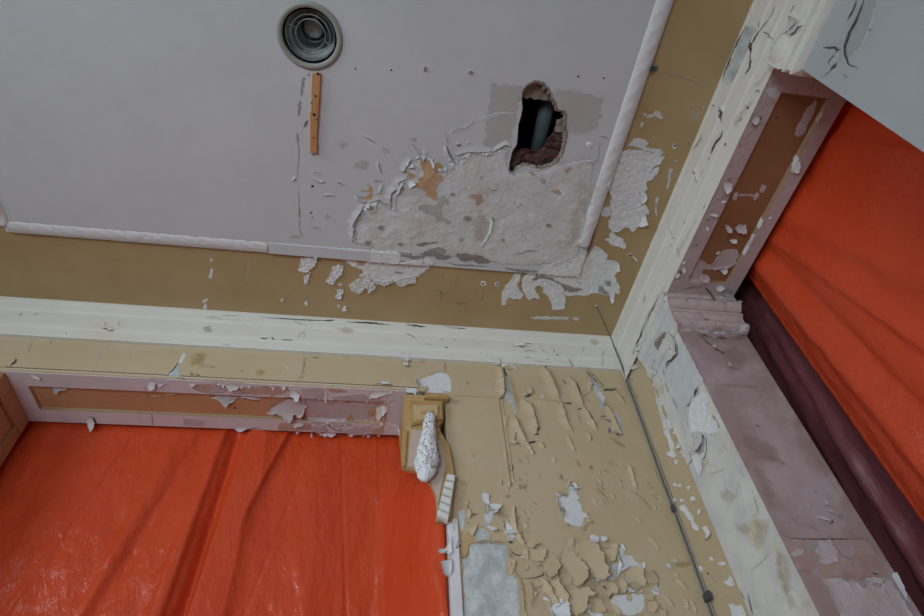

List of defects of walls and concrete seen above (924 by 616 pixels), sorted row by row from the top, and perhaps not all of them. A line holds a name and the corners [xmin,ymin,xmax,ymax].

crack [823,46,848,77]
peeling [346,80,596,266]
peeling [790,155,801,173]
spalling [349,274,416,294]
peeling [661,181,772,305]
peeling [147,351,400,438]
peeling [406,362,452,395]
peeling [480,353,545,453]
peeling [628,318,748,475]
peeling [438,471,677,616]
peeling [673,483,711,540]
peeling [783,515,913,616]